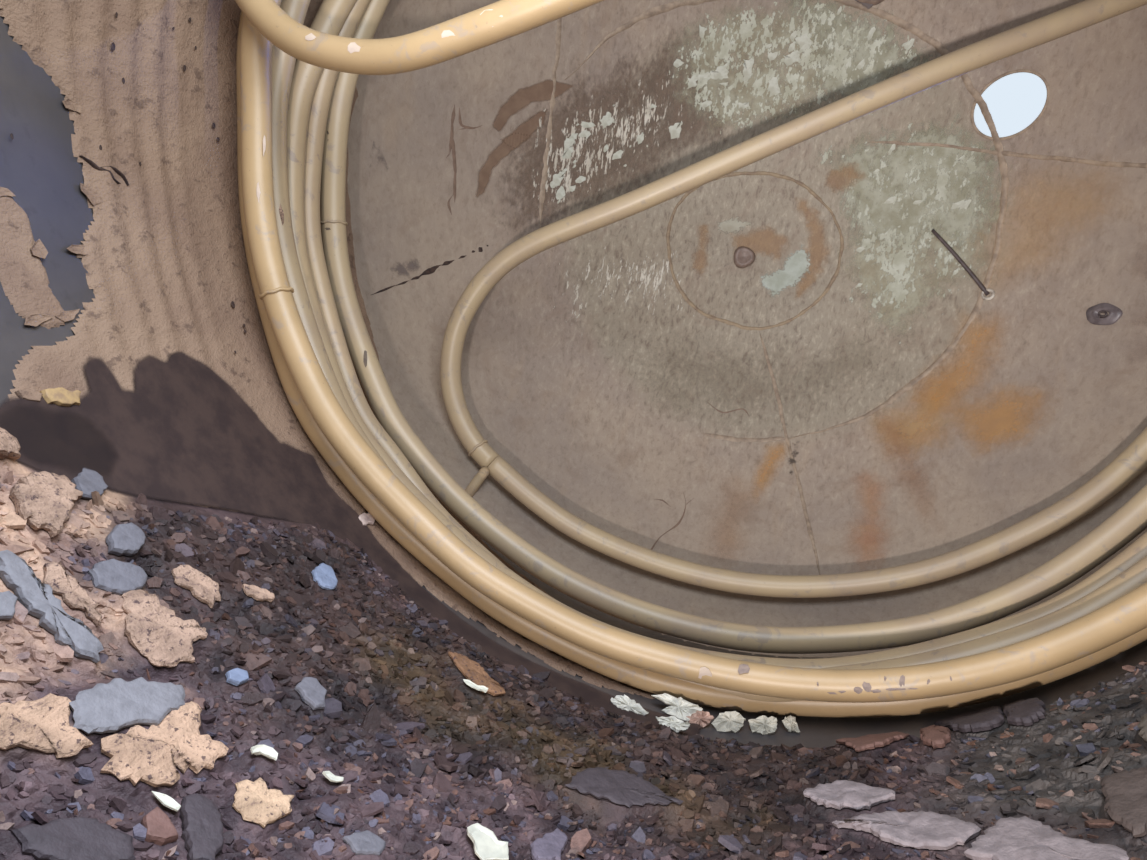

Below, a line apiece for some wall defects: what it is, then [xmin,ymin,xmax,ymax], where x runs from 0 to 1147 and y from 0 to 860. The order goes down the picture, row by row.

water stain [477,0,927,217]
peeling [0,0,800,735]
crack [371,245,488,295]
water stain [553,246,694,322]
water stain [761,250,810,296]
water stain [820,116,1000,344]